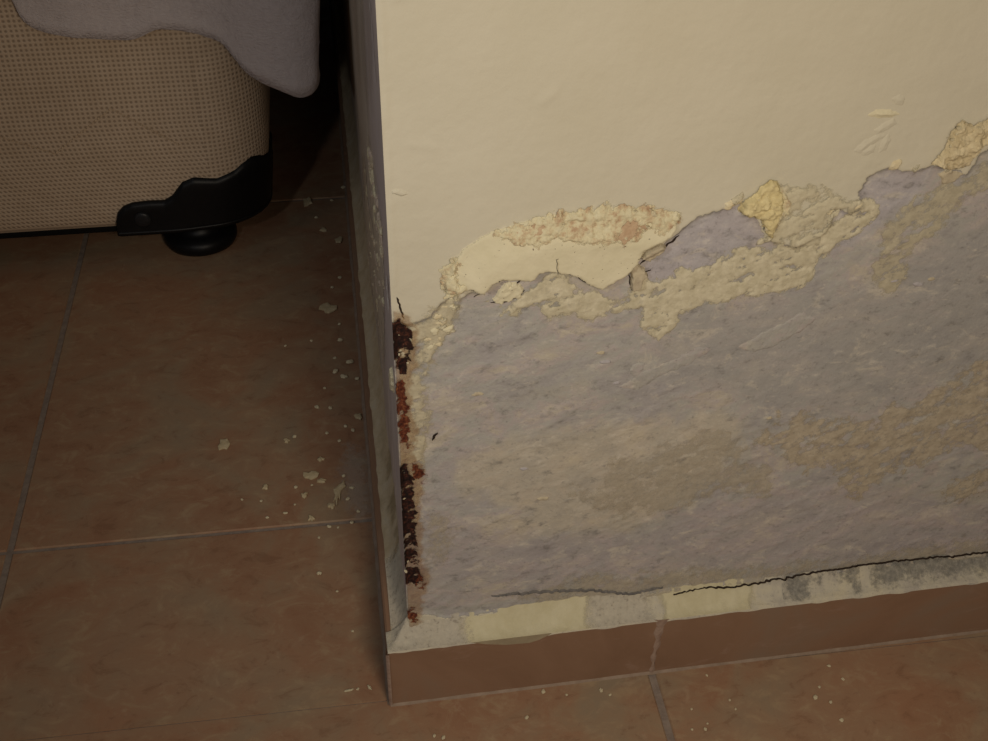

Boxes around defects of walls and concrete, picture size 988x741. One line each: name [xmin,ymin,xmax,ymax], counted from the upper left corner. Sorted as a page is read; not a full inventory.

corrosion [392,318,414,449]
peeling [388,119,988,618]
corrosion [400,463,428,590]
crack [491,551,988,597]